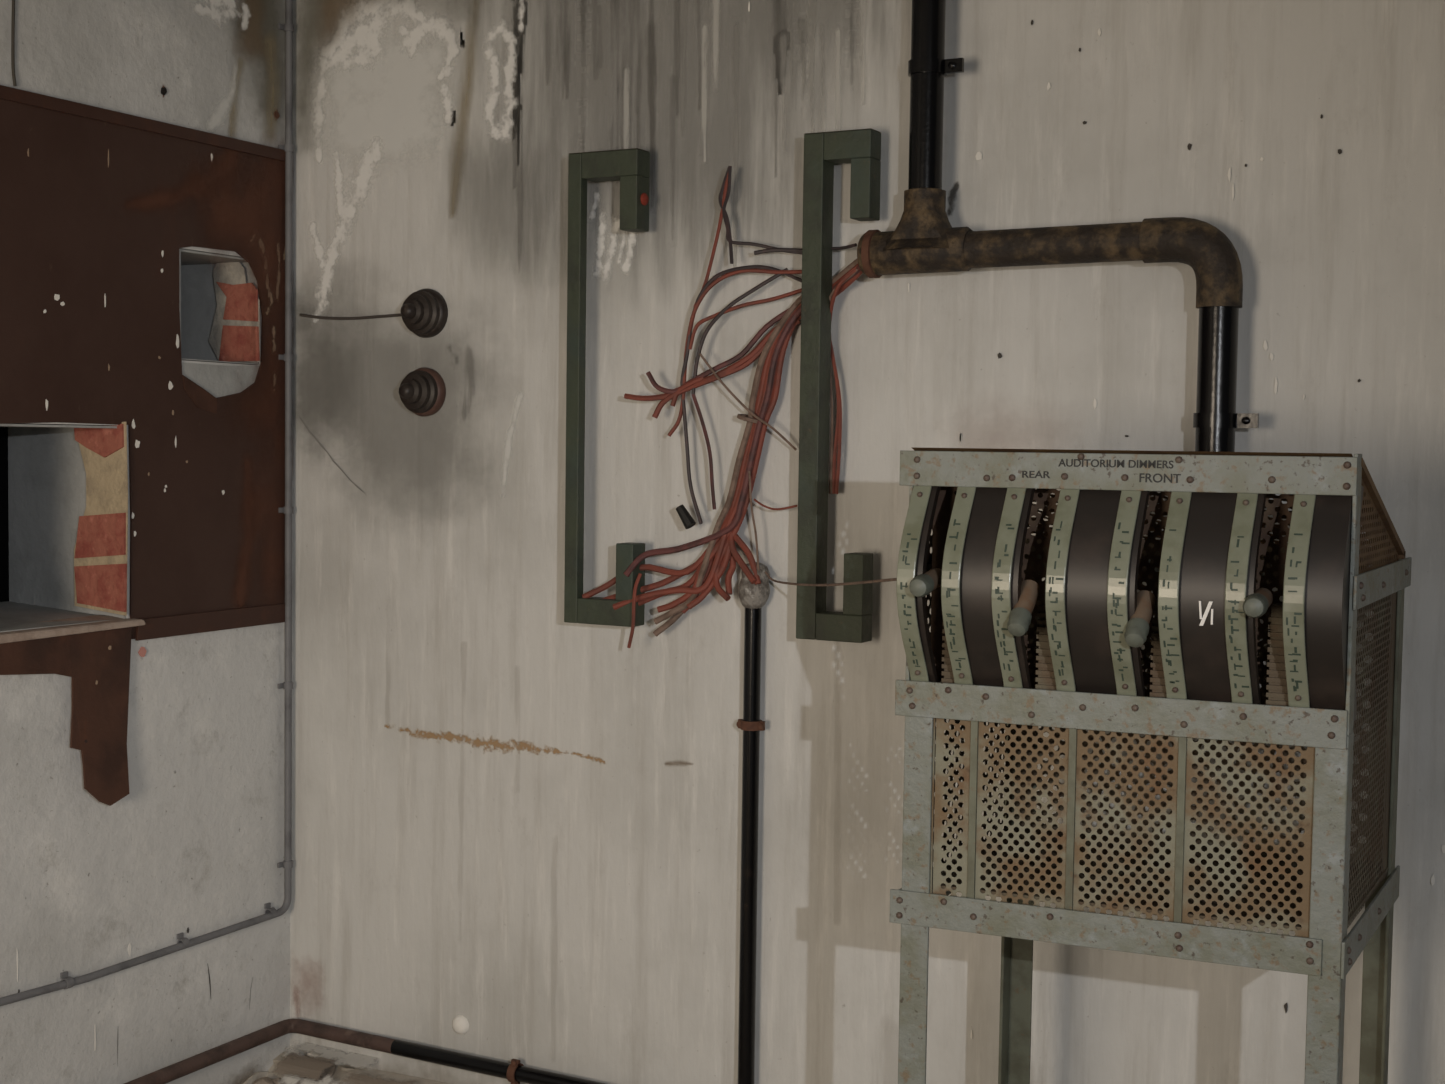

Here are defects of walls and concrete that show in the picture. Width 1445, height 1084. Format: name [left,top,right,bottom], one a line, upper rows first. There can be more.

damp [194,0,284,134]
damp [300,0,471,322]
damp [484,0,525,140]
damp [545,0,862,281]
spalling [168,238,285,414]
spalling [74,419,140,616]
corrosion [385,725,605,763]
spalling [243,1043,414,1084]